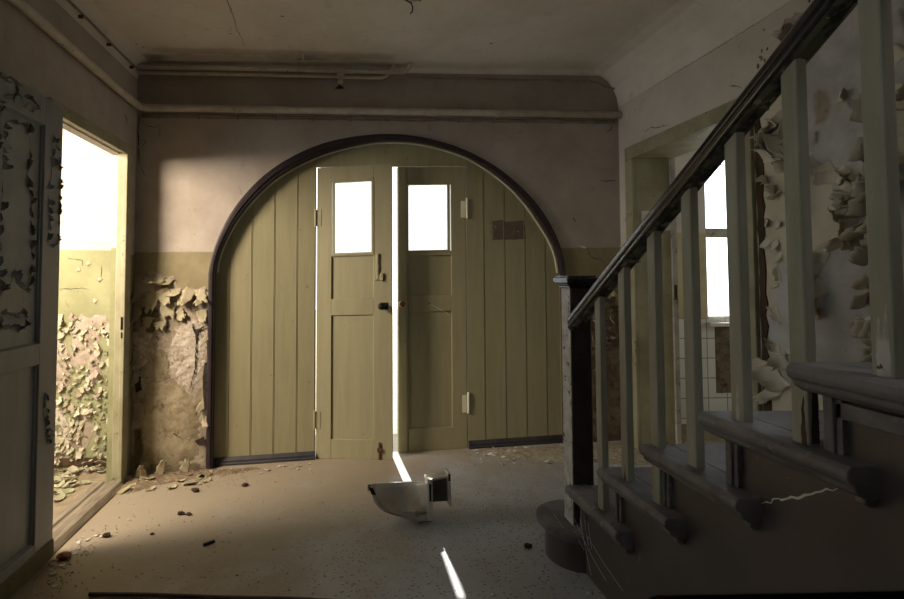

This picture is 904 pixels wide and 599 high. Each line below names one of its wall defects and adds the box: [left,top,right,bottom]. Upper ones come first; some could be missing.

peeling [0,72,64,296]
peeling [748,108,785,200]
peeling [806,5,891,378]
peeling [891,0,904,281]
peeling [0,308,31,333]
peeling [43,313,109,466]
peeling [129,271,208,474]
crack [188,324,204,391]
peeling [751,218,791,404]
crack [761,488,838,504]